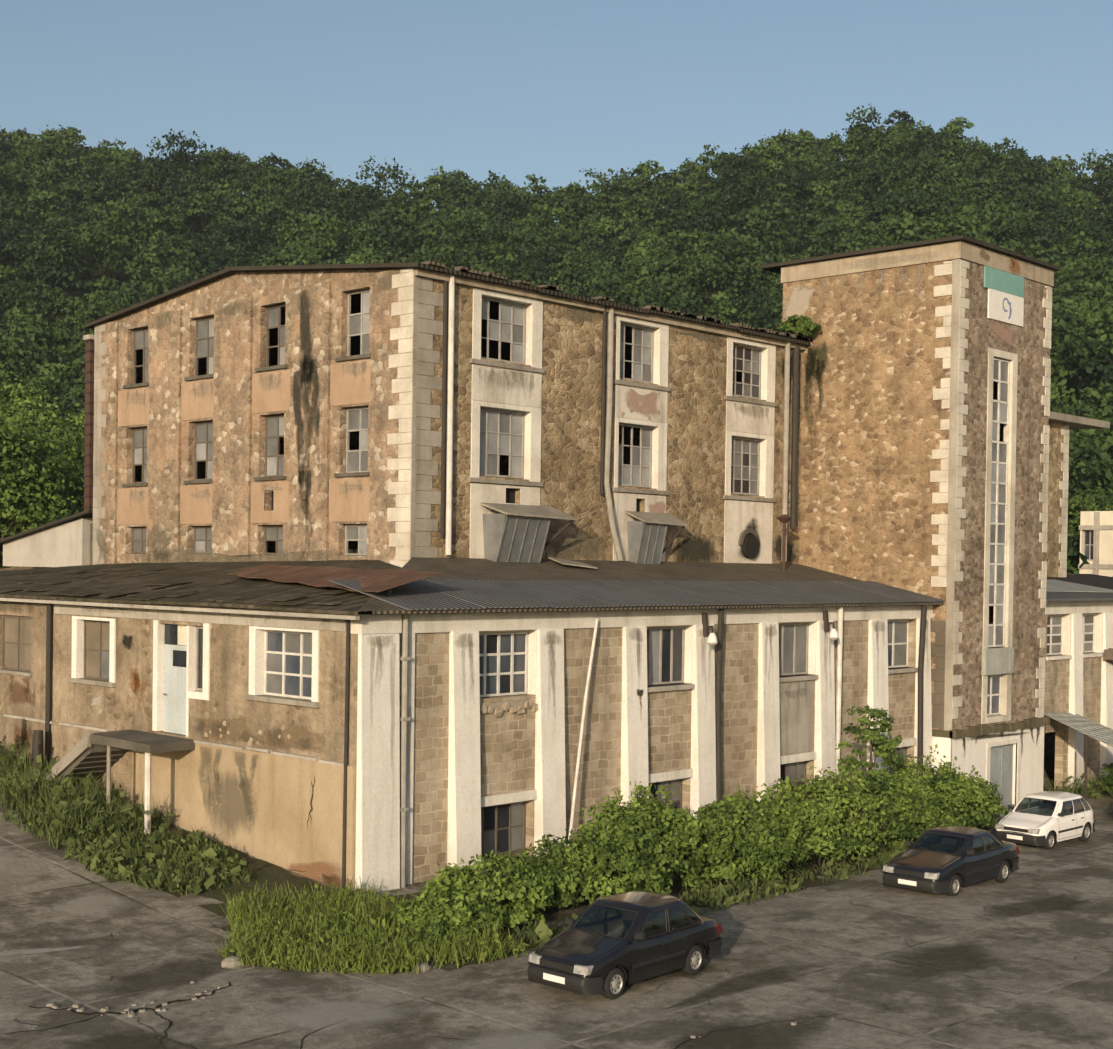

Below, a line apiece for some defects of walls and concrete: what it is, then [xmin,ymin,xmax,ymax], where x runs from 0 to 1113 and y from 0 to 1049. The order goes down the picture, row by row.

leakage [293,290,319,530]
peeling [621,389,661,421]
rust [131,671,146,691]
leakage [202,750,256,829]
crack [307,777,316,829]
crack [3,981,231,1049]